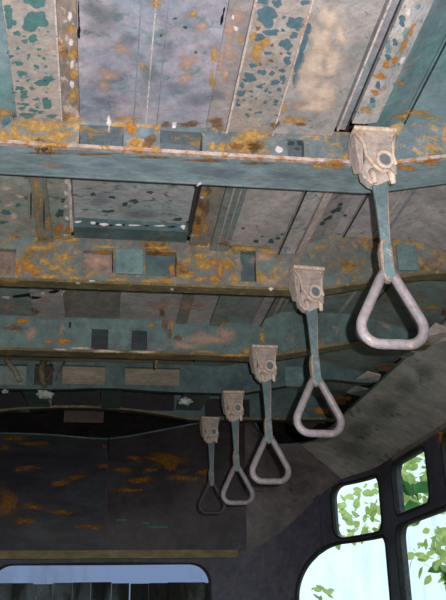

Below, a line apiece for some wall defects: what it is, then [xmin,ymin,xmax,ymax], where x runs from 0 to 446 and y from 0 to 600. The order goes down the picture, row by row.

peeling [4,0,58,119]
peeling [236,0,345,117]
rust [0,109,83,155]
rust [116,116,198,147]
rust [187,129,268,162]
rust [271,104,305,130]
rust [393,109,440,120]
rust [190,182,211,237]
rust [4,245,127,283]
rust [169,242,276,282]